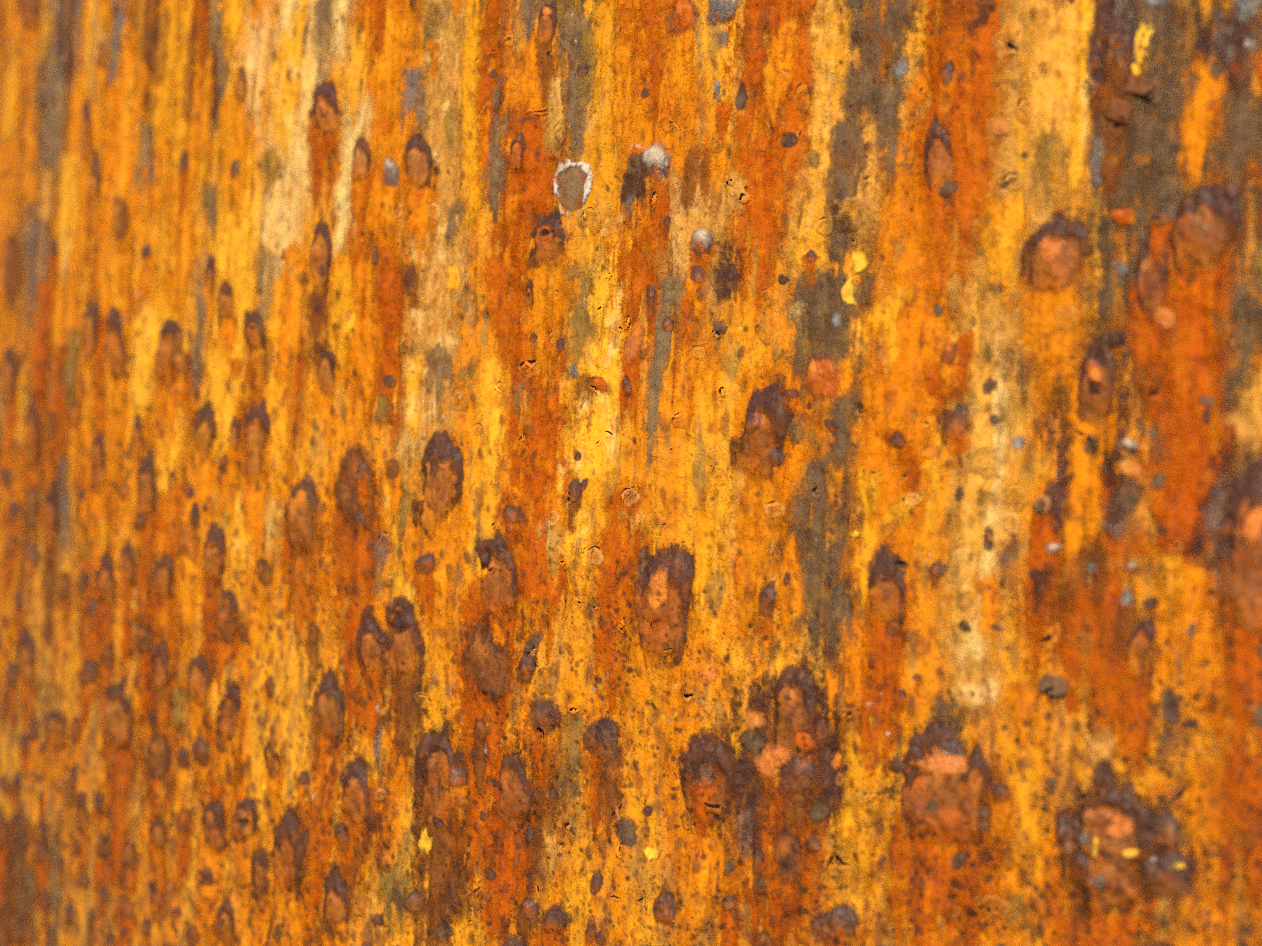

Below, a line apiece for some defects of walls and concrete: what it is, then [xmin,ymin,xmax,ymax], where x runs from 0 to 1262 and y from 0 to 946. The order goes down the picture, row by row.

rust [0,0,865,946]
rust [726,0,1262,946]